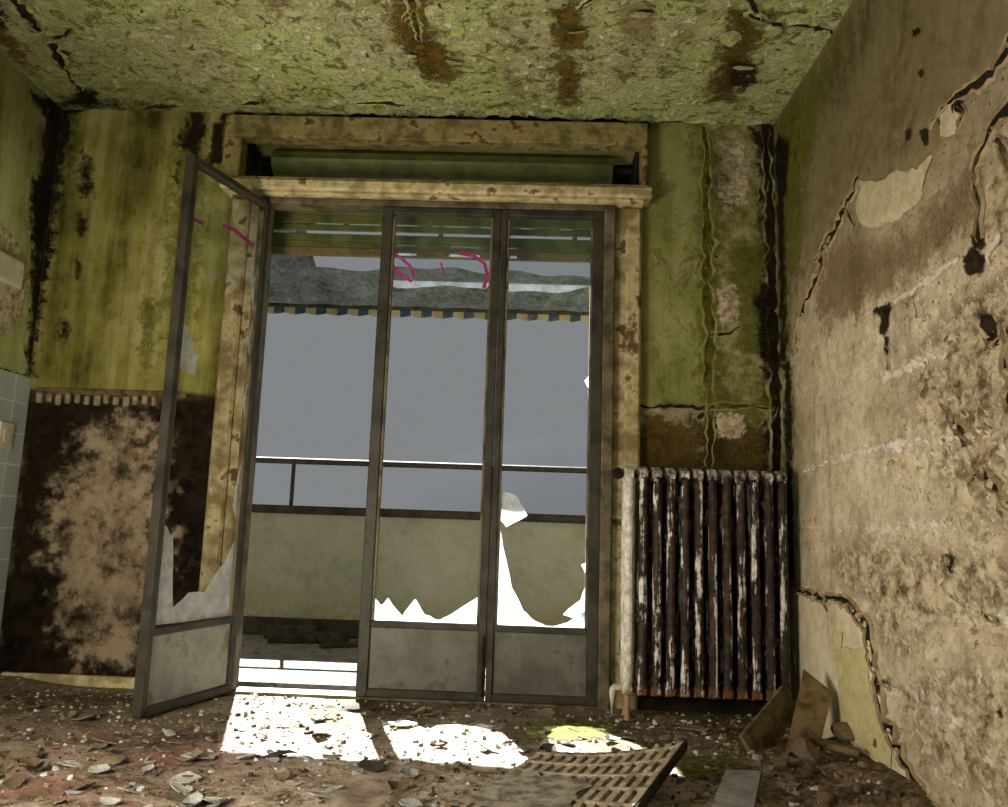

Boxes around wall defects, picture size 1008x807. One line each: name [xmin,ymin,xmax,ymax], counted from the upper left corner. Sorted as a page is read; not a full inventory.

water stain [24,88,176,378]
corrosion [376,0,466,88]
crack [231,97,860,472]
water stain [640,124,829,588]
peeling [855,128,932,228]
peeling [936,93,964,137]
crack [927,32,1008,130]
crack [988,126,1008,179]
water stain [0,396,162,677]
water stain [161,399,215,607]
spalling [830,232,1008,807]
crack [792,583,942,807]